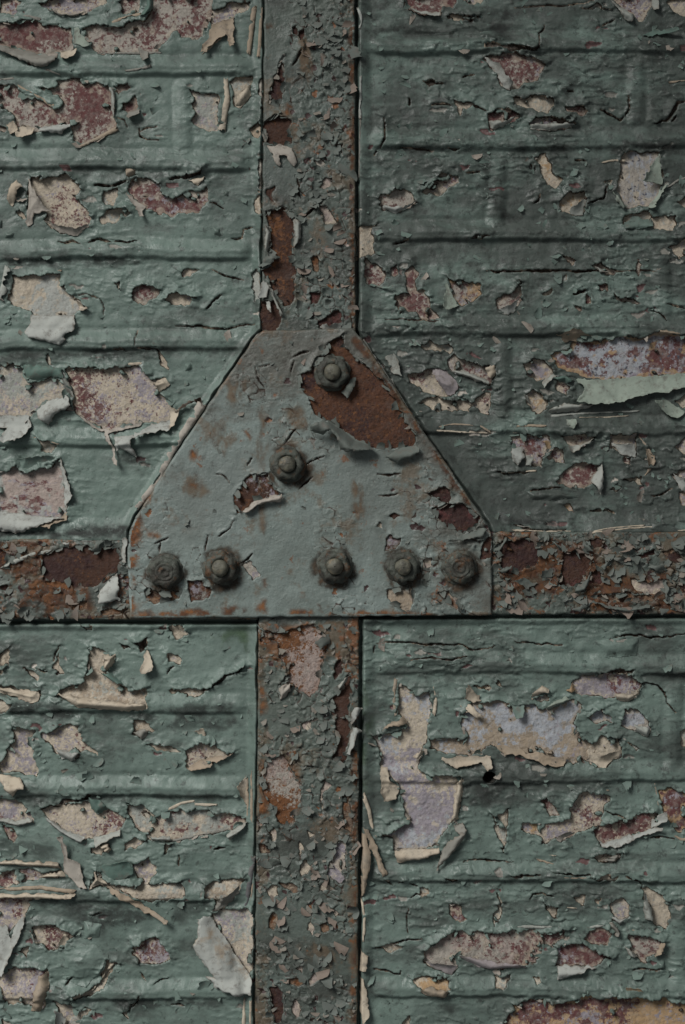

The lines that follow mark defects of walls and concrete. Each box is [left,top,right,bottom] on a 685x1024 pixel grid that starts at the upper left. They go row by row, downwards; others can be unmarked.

peeling [0,0,264,153]
peeling [0,152,224,236]
rust [257,186,301,331]
peeling [287,0,491,351]
peeling [0,254,202,563]
rust [297,301,421,463]
peeling [482,148,685,619]
rust [0,518,211,618]
rust [234,473,283,531]
rust [429,450,680,612]
rust [258,610,363,834]
peeling [0,620,685,1024]